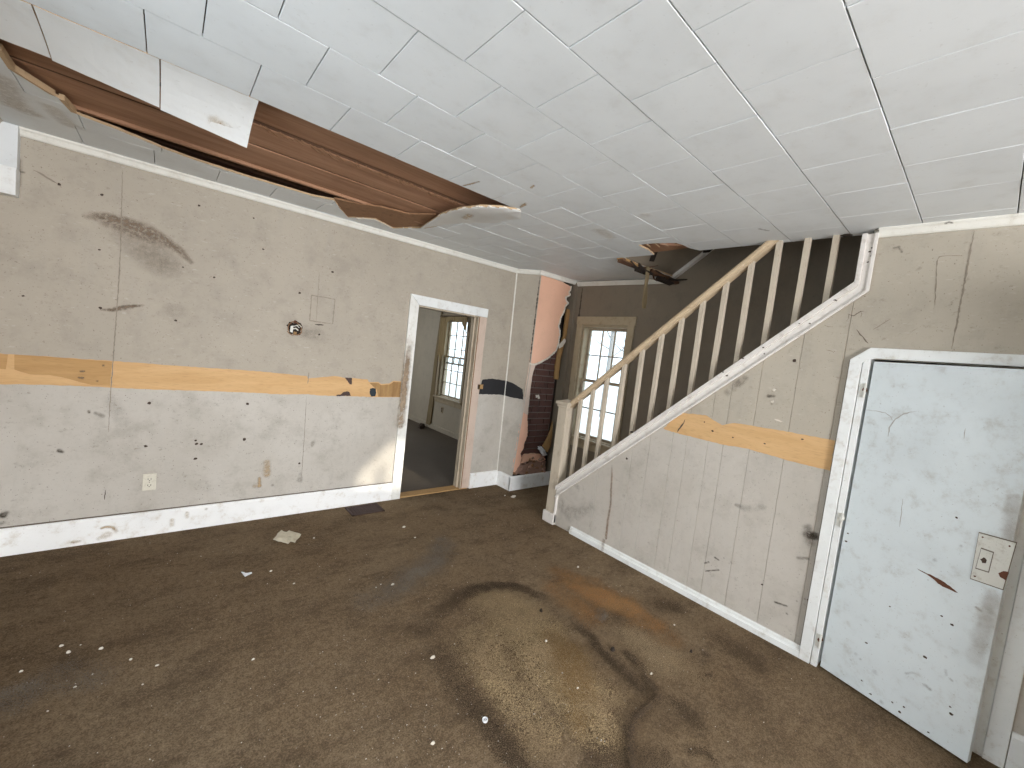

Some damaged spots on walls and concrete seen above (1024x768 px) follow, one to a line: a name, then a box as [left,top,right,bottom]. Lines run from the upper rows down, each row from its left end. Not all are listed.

spalling [0,43,77,114]
flaking render [521,286,572,458]